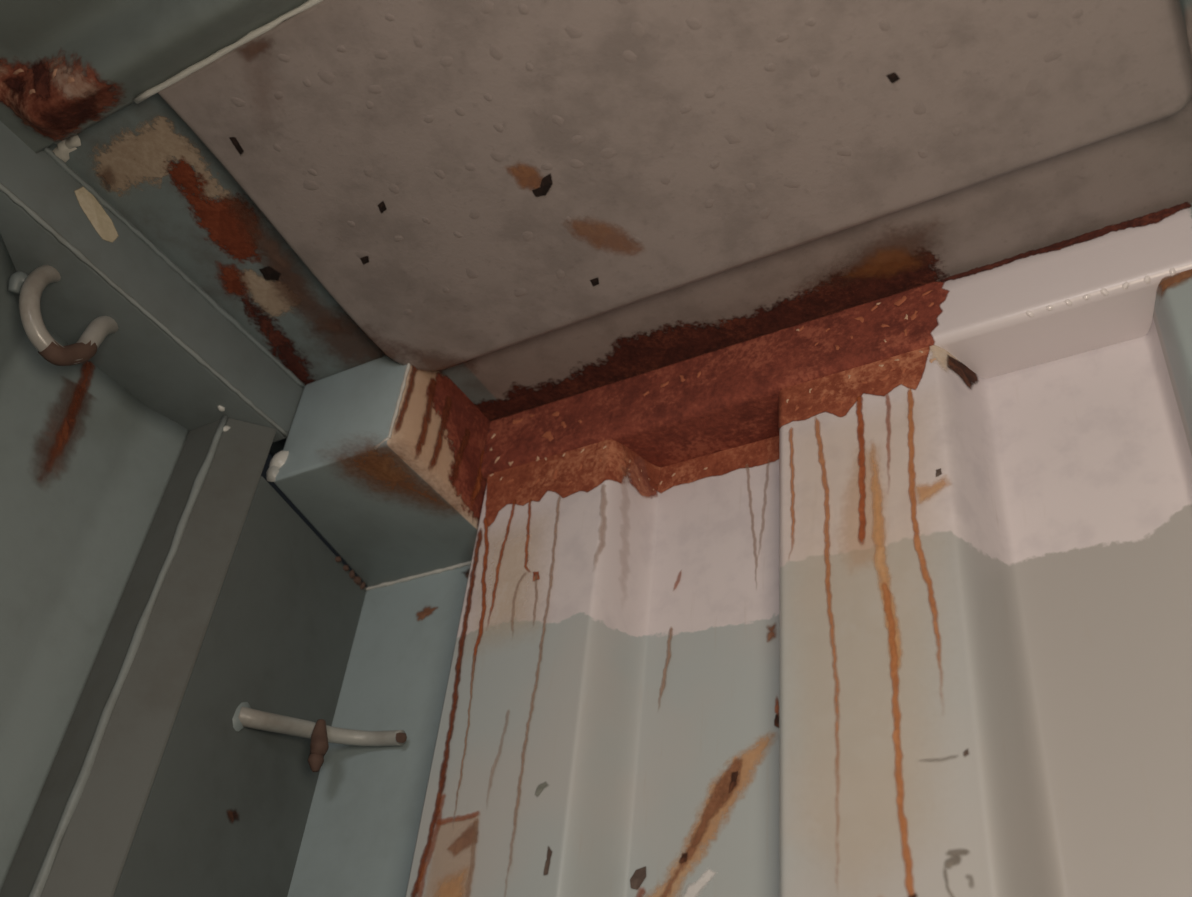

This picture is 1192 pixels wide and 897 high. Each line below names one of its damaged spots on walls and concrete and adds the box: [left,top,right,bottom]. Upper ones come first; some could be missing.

corrosion [0,55,123,141]
corrosion [510,165,552,197]
corrosion [168,159,394,386]
corrosion [38,340,98,470]
corrosion [338,202,1192,897]